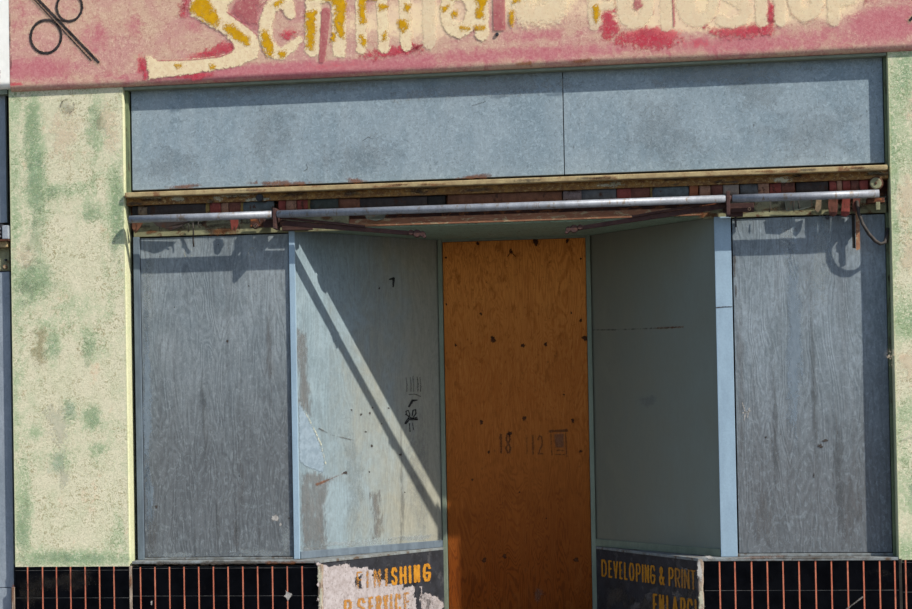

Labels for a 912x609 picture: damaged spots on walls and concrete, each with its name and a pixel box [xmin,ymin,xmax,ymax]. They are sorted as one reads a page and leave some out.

peeling [232,0,261,25]
peeling [599,9,683,50]
peeling [703,3,775,41]
peeling [191,42,230,58]
peeling [359,43,424,60]
corrosion [756,169,816,182]
corrosion [208,181,305,203]
peeling [316,562,444,609]